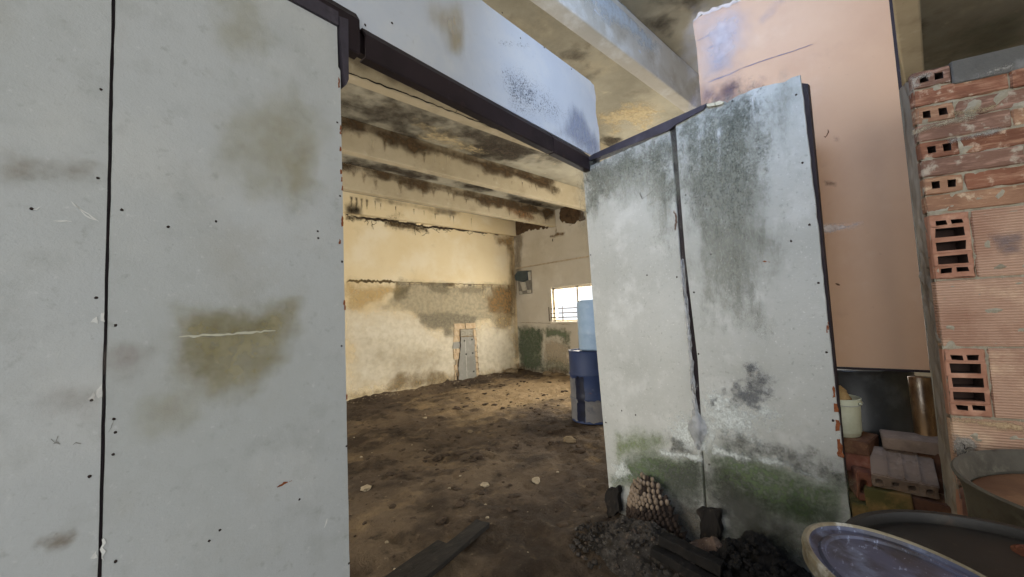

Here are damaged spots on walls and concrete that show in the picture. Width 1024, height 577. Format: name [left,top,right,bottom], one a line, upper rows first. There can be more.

water stain [342,159,554,219]
water stain [341,98,556,193]
water stain [583,99,767,292]
water stain [179,314,283,380]
water stain [661,364,840,479]
water stain [614,463,630,478]